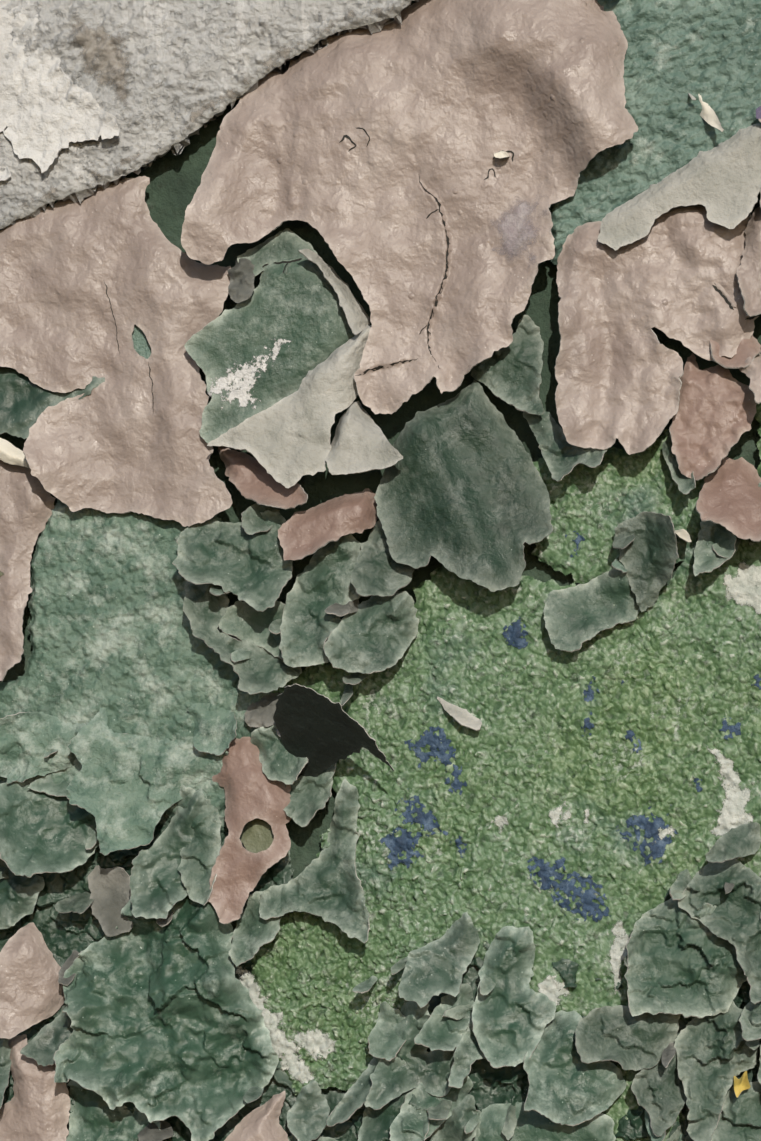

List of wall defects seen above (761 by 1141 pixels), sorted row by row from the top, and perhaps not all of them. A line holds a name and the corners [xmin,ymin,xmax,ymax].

peeling [0,166,11,181]
peeling [0,0,120,173]
peeling [0,176,419,703]
crack [355,176,451,376]
peeling [181,0,638,592]
peeling [523,124,761,584]
peeling [688,93,724,132]
peeling [0,457,761,1141]